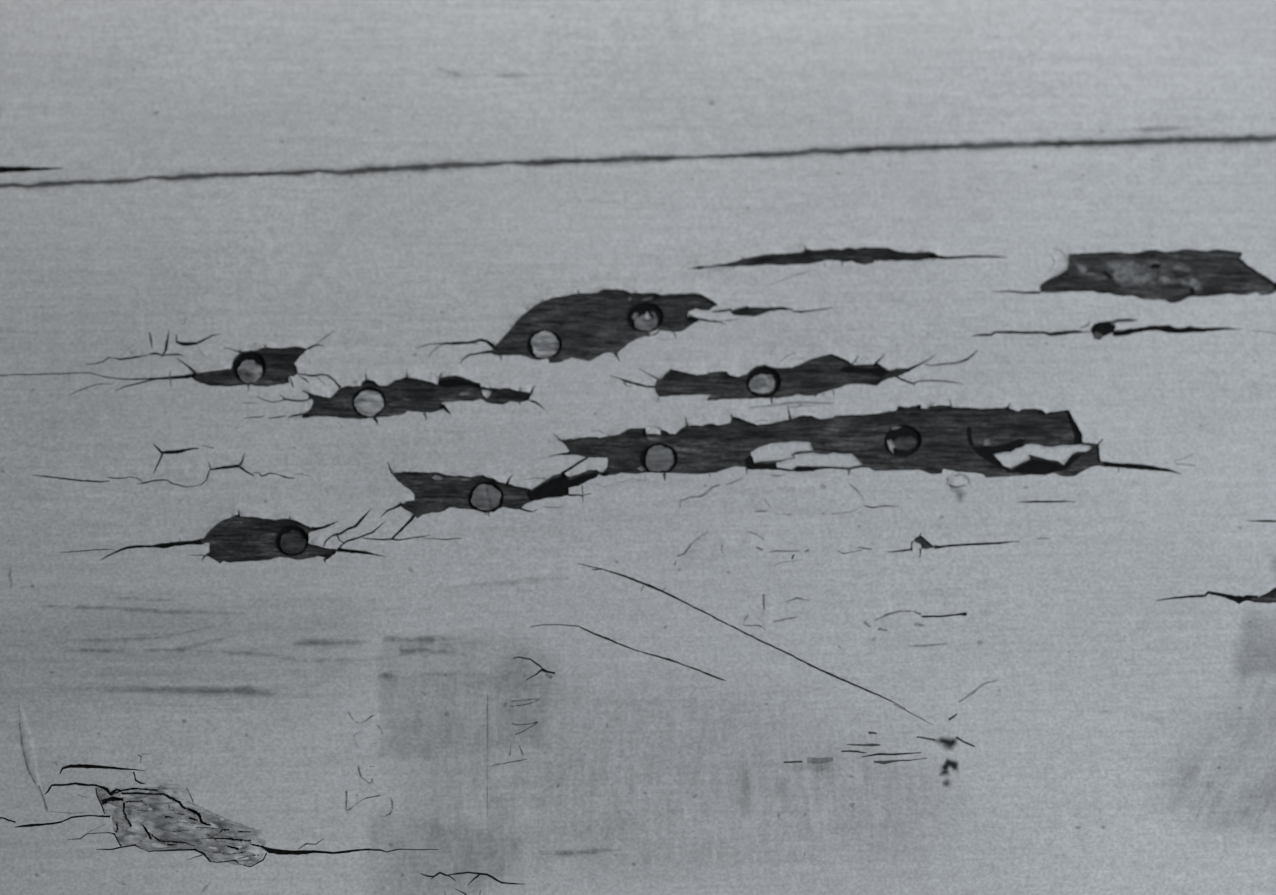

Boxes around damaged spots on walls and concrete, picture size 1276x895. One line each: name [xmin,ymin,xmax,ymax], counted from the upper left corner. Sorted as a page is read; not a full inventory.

peeling [723,249,1008,287]
peeling [996,248,1276,303]
peeling [418,289,834,363]
crack [973,319,1276,340]
peeling [0,317,544,425]
crack [32,444,308,487]
peeling [71,350,1196,563]
peeling [1156,587,1276,604]
crack [513,656,555,680]
crack [531,624,726,681]
crack [577,563,998,764]
crack [0,753,519,895]